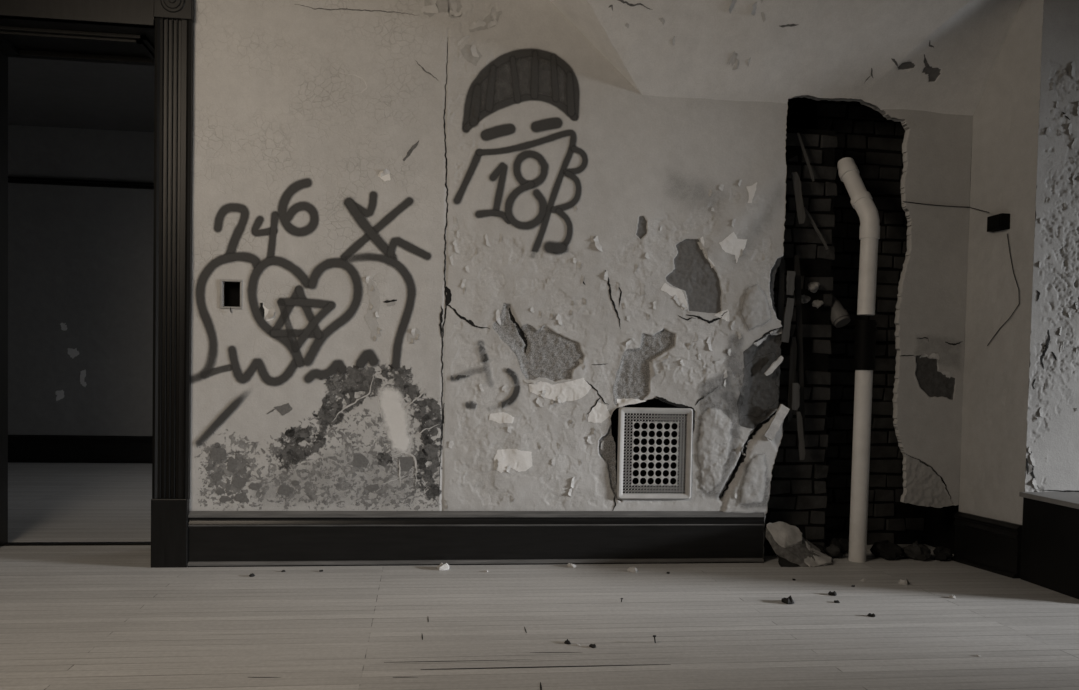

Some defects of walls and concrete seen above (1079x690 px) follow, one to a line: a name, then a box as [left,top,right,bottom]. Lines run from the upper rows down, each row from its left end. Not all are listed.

crack [609,0,652,11]
spalling [891,41,941,82]
spalling [636,216,647,239]
flaking render [719,219,747,263]
spalling [493,298,592,407]
spalling [568,236,783,501]
spalling [915,353,955,400]
damp [197,364,444,510]
flaking render [489,412,515,433]
flaking render [493,442,541,473]
crack [906,454,953,504]